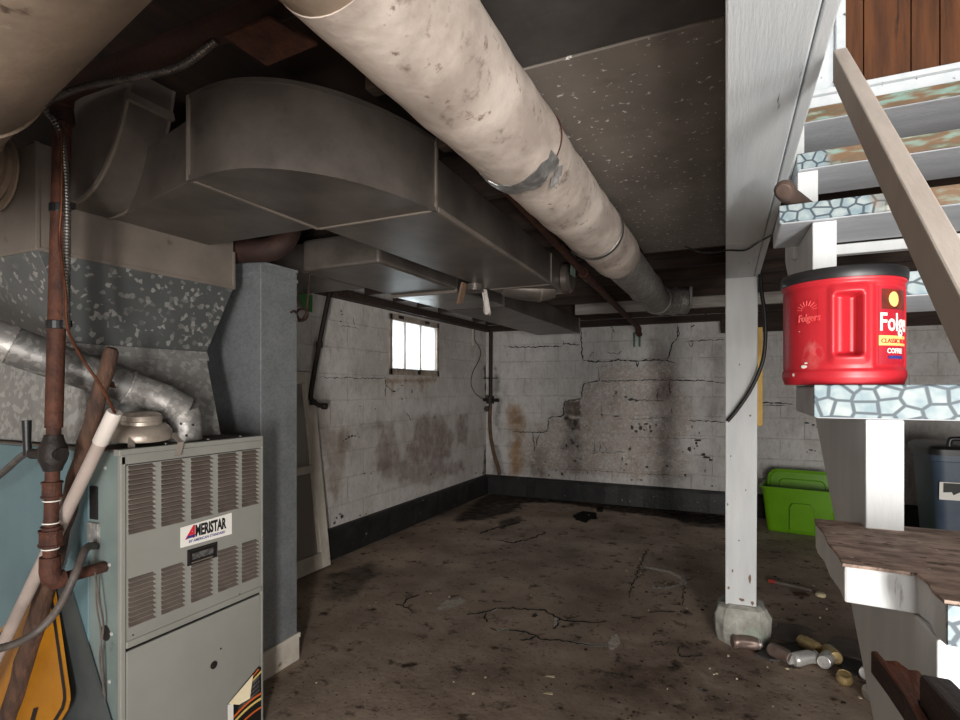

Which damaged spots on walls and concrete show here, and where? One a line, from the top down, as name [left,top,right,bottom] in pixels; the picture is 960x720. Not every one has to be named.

crack [506,324,723,477]
crack [480,507,546,543]
damp [456,494,725,528]
crack [628,550,649,598]
crack [467,607,608,646]